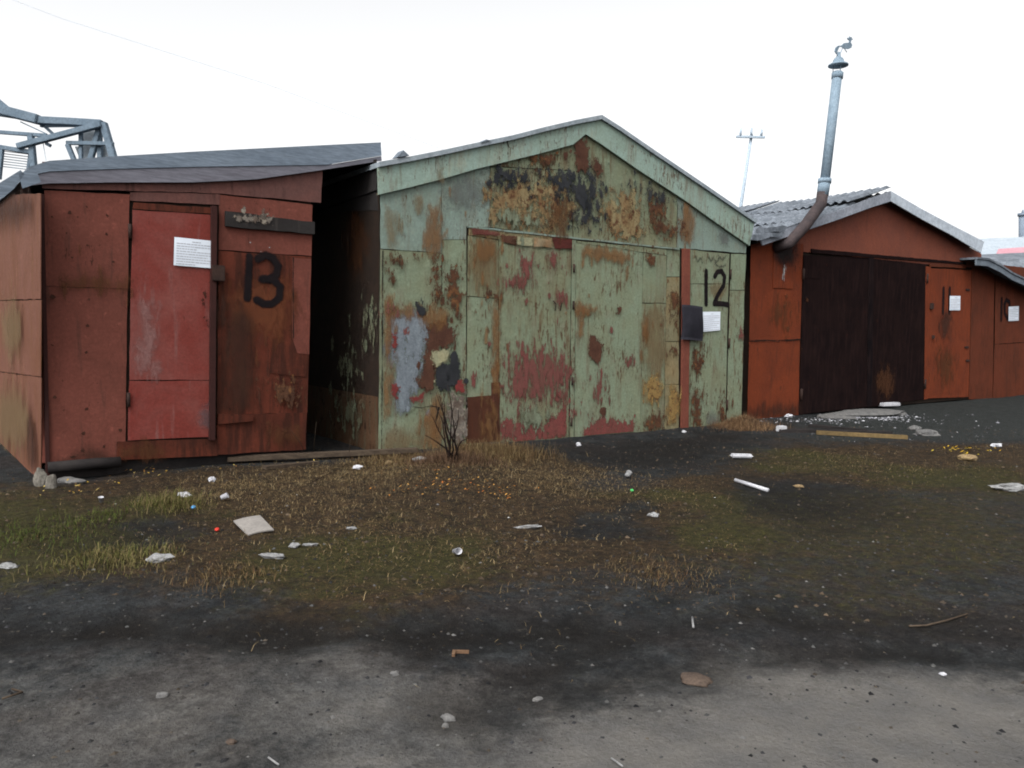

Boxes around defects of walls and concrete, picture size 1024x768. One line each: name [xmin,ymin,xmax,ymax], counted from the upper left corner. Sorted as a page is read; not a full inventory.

rust [417,187,451,257]
rust [581,186,695,281]
peeling [621,170,682,240]
peeling [328,137,641,447]
rust [642,373,734,432]